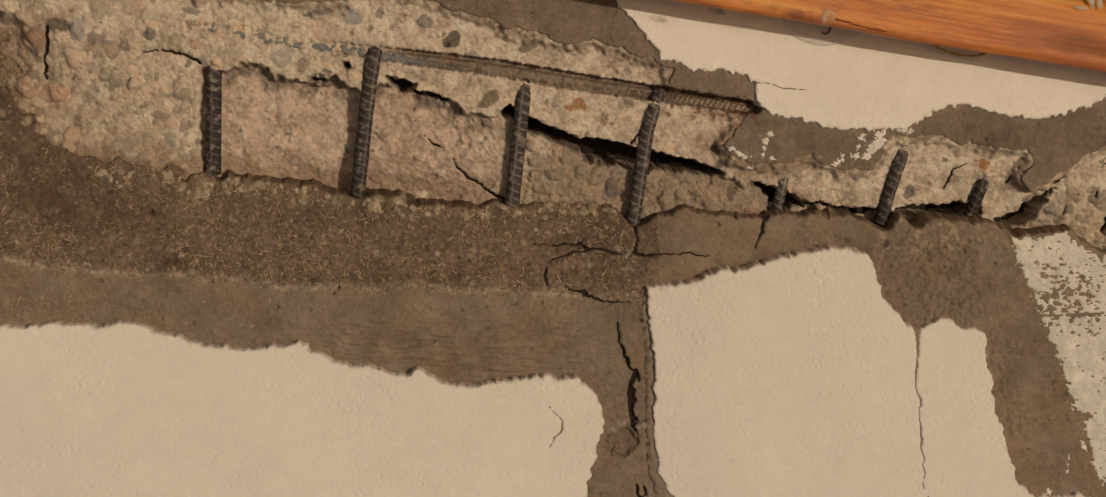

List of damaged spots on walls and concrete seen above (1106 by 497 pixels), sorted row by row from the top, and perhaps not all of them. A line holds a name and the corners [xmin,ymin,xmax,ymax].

crack [414,90,448,100]
spalling [0,0,884,221]
crack [424,135,505,200]
crack [503,104,708,167]
crack [533,227,710,497]
crack [913,328,929,497]